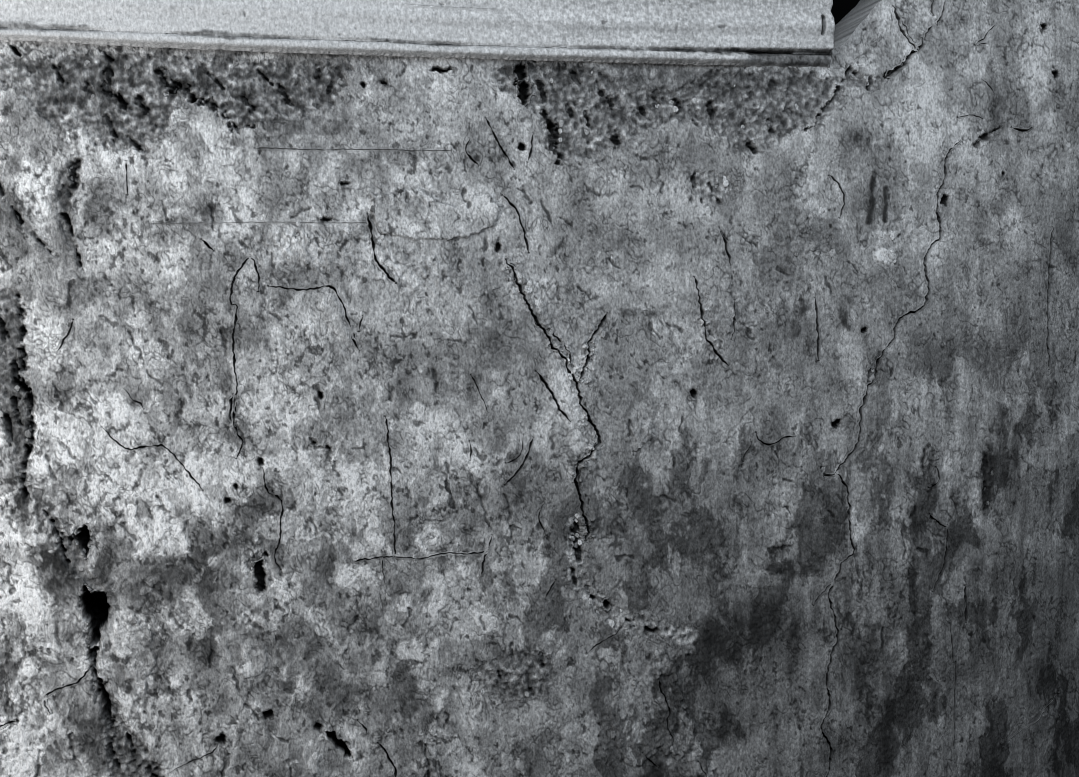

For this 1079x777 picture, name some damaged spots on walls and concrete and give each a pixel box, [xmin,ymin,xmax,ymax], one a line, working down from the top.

crack [883,0,947,79]
crack [975,24,997,47]
spalling [0,40,392,274]
spalling [488,60,890,175]
crack [1011,125,1034,133]
crack [813,79,995,777]
spalling [0,283,169,777]
crack [544,579,557,600]
crack [587,627,622,654]
crack [657,679,675,742]